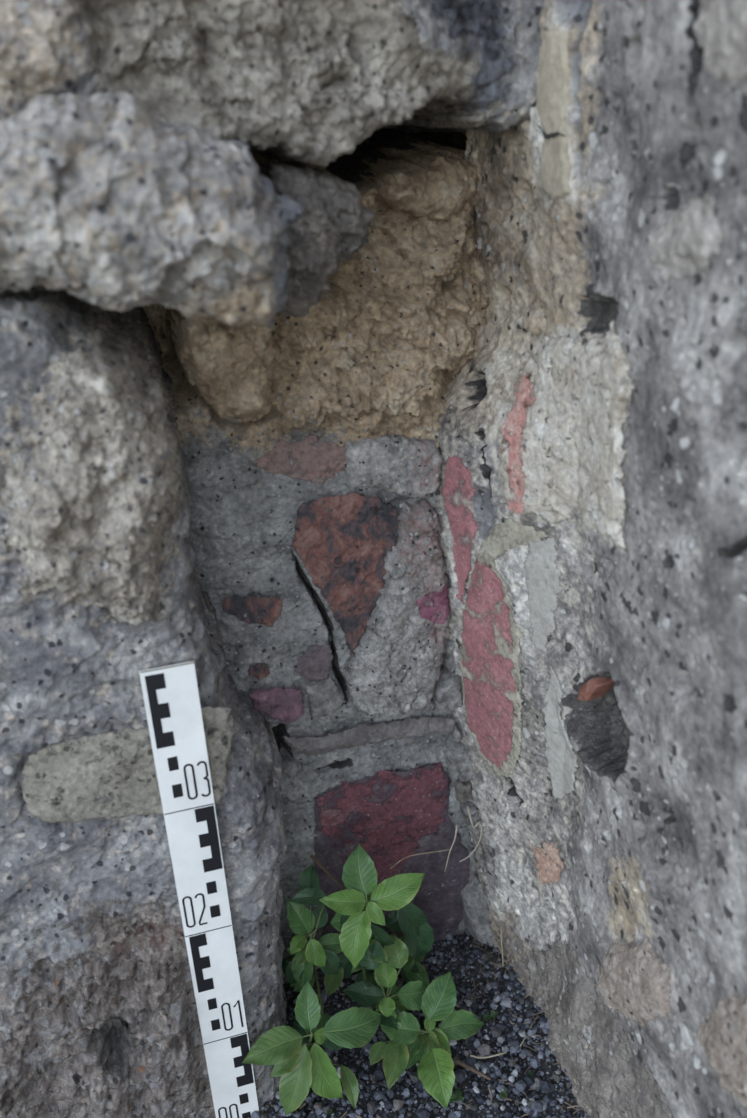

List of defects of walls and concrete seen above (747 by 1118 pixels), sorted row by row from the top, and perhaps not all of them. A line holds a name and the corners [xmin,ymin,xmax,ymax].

crack [291,550,348,716]
flaking render [458,320,635,800]